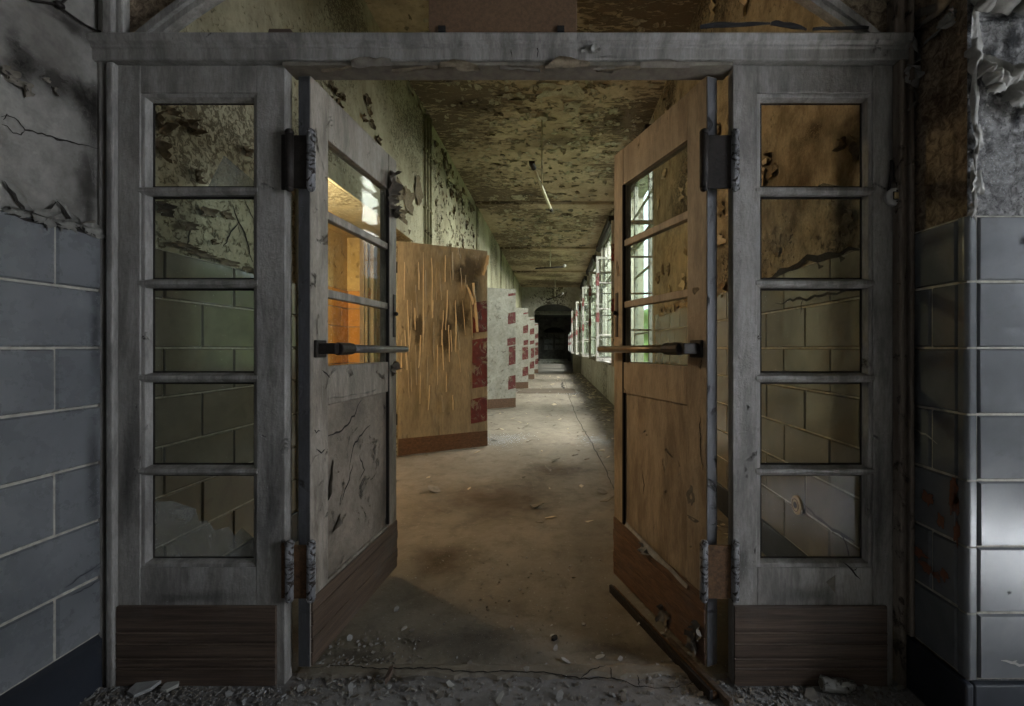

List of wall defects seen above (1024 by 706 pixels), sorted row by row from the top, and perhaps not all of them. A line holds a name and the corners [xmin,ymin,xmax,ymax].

crack [2,114,98,149]
peeling [321,16,690,260]
spalling [964,2,985,221]
peeling [1,179,106,239]
peeling [655,263,687,317]
crack [561,382,614,488]
crack [302,665,693,688]